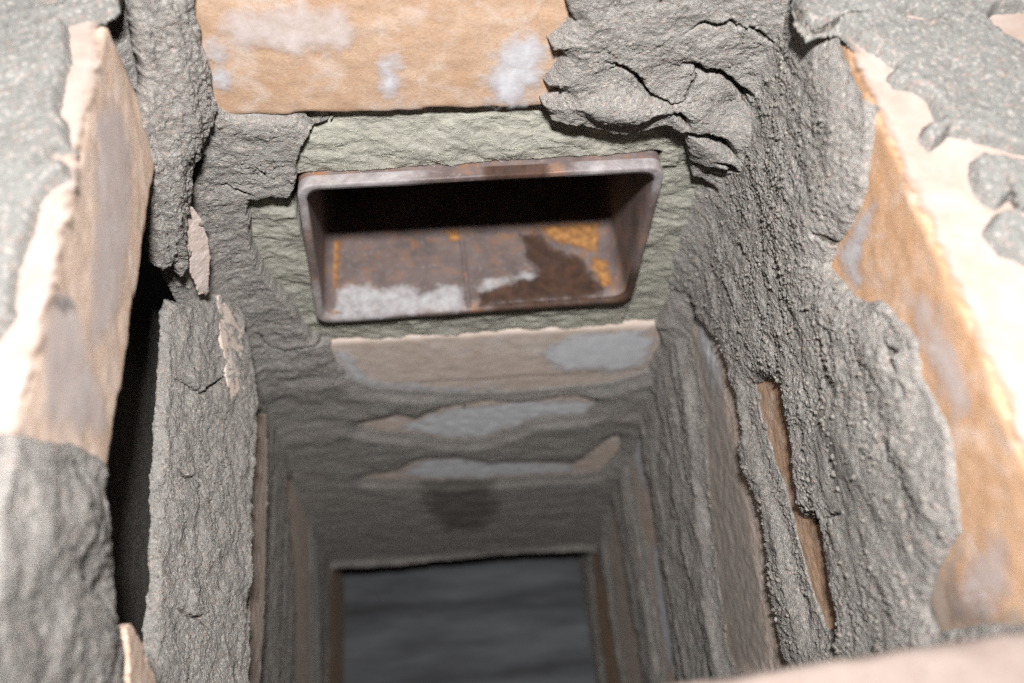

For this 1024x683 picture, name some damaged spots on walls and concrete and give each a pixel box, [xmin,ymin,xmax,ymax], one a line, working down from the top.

crack [704,20,773,42]
crack [614,62,755,126]
rust [485,164,546,181]
rust [480,223,637,312]
spalling [358,395,597,440]
spalling [363,435,620,480]
spalling [756,379,837,630]